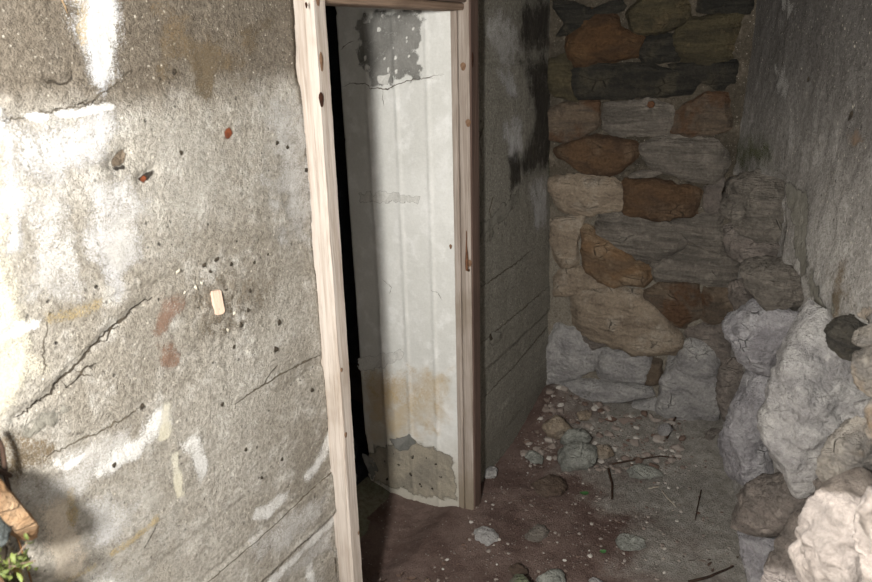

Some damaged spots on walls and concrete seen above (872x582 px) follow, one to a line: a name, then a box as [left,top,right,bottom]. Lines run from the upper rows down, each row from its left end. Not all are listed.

peeling [353,9,433,89]
damp [483,0,550,233]
crack [16,297,152,417]
crack [42,408,139,458]
spalling [362,434,457,500]